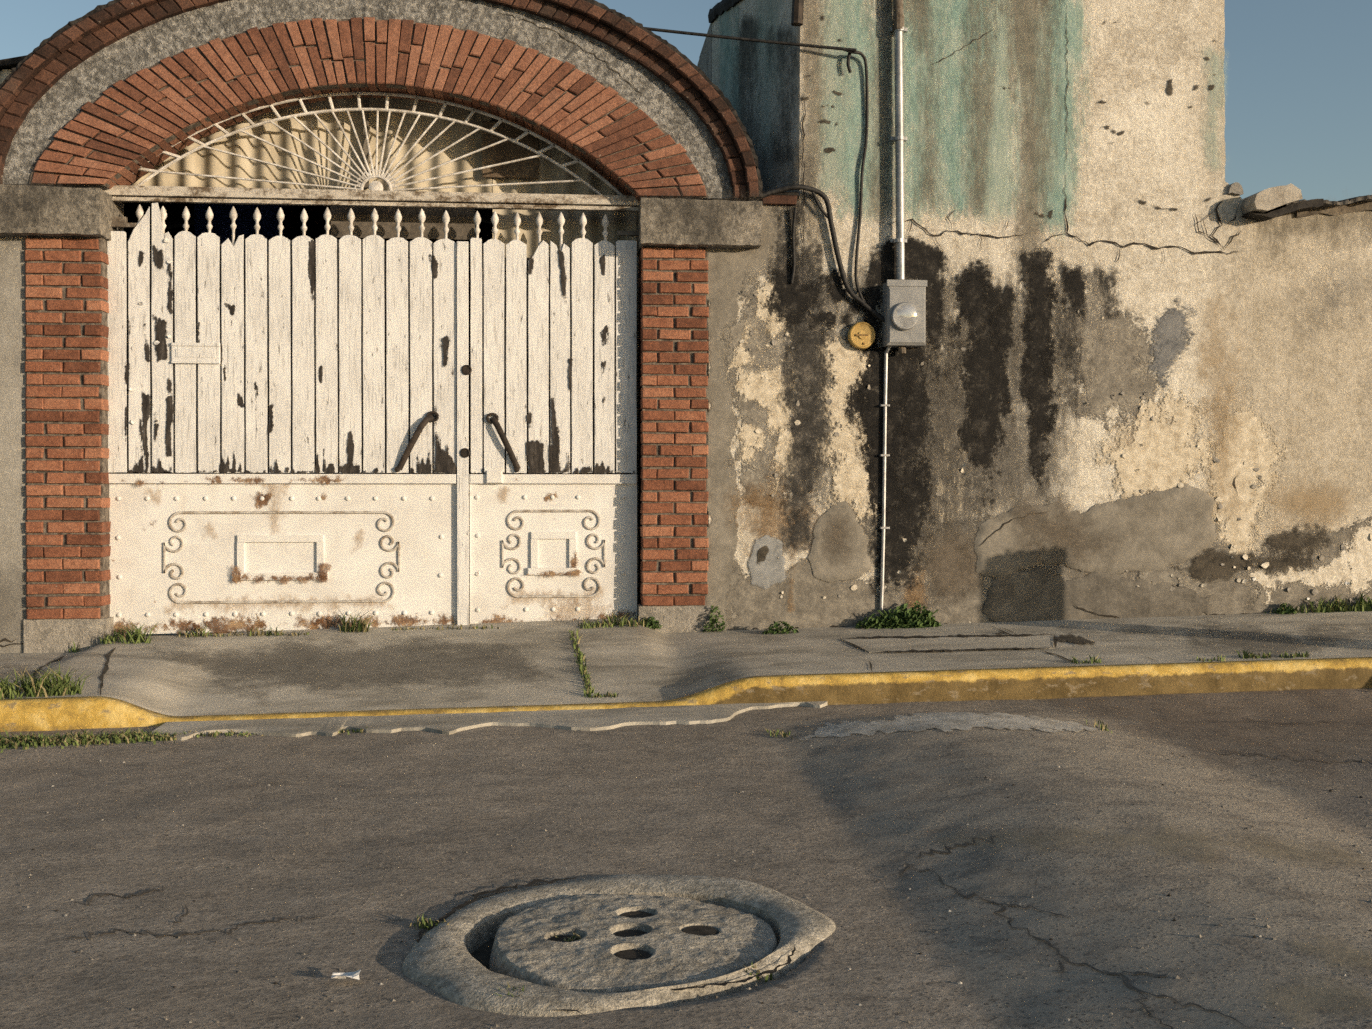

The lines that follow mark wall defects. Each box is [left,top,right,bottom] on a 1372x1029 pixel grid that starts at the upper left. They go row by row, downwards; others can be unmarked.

crack [886,6,1241,265]
damp [719,0,1120,597]
peeling [124,238,174,474]
peeling [197,431,383,474]
peeling [526,398,635,474]
flaking render [707,199,996,631]
peeling [1055,268,1372,615]
rust [207,476,272,509]
rust [230,563,331,585]
rust [528,552,581,578]
rust [113,613,266,636]
rust [295,613,456,629]